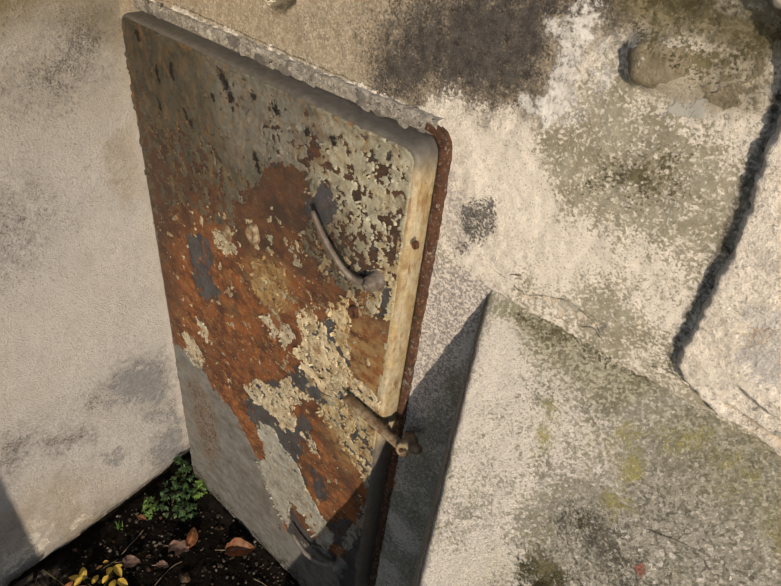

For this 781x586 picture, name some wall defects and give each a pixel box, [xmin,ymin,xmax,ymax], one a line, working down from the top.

peeling [141,0,333,87]
damp [342,0,781,195]
damp [570,143,694,216]
rust [135,78,409,462]
peeling [121,17,425,586]
damp [454,185,546,290]
mould [78,358,188,468]
rust [287,396,369,559]
damp [527,540,571,586]